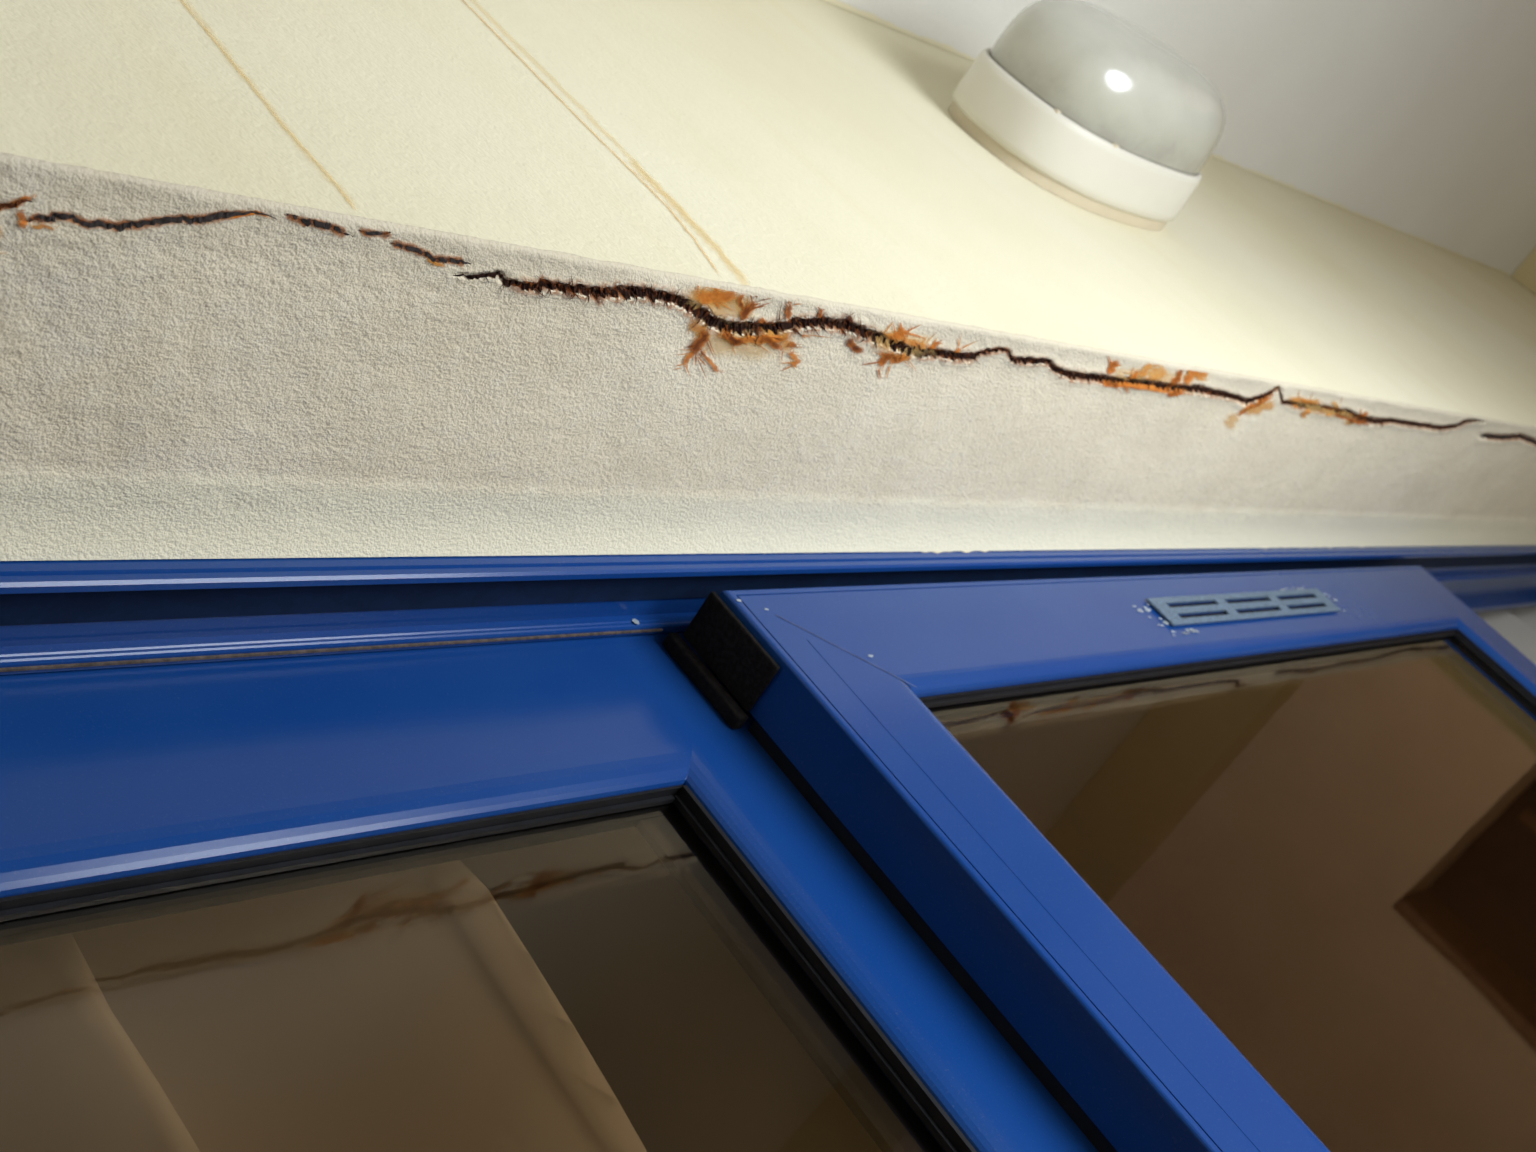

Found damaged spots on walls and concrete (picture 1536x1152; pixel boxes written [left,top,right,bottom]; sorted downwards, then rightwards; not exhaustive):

rust [0,194,53,232]
rust [677,286,828,377]
crack [0,200,1536,445]
rust [844,313,977,378]
rust [1103,358,1208,397]